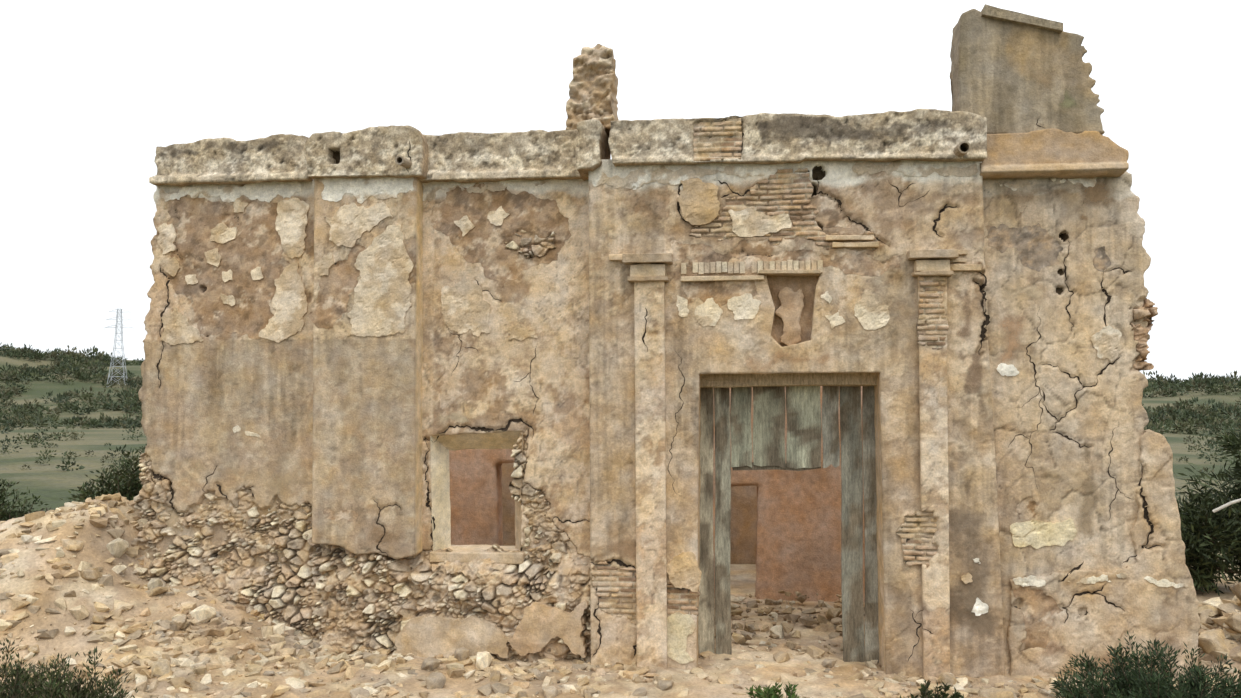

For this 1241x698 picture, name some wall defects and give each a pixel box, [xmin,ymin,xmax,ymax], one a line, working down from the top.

flaking render [157,197,414,345]
flaking render [429,183,571,334]
flaking render [671,166,902,330]
crack [808,170,887,245]
crack [889,183,956,237]
flaking render [916,276,949,350]
crack [373,348,538,561]
crack [1008,233,1161,623]
flaking render [130,429,637,663]
flaking render [896,511,938,567]